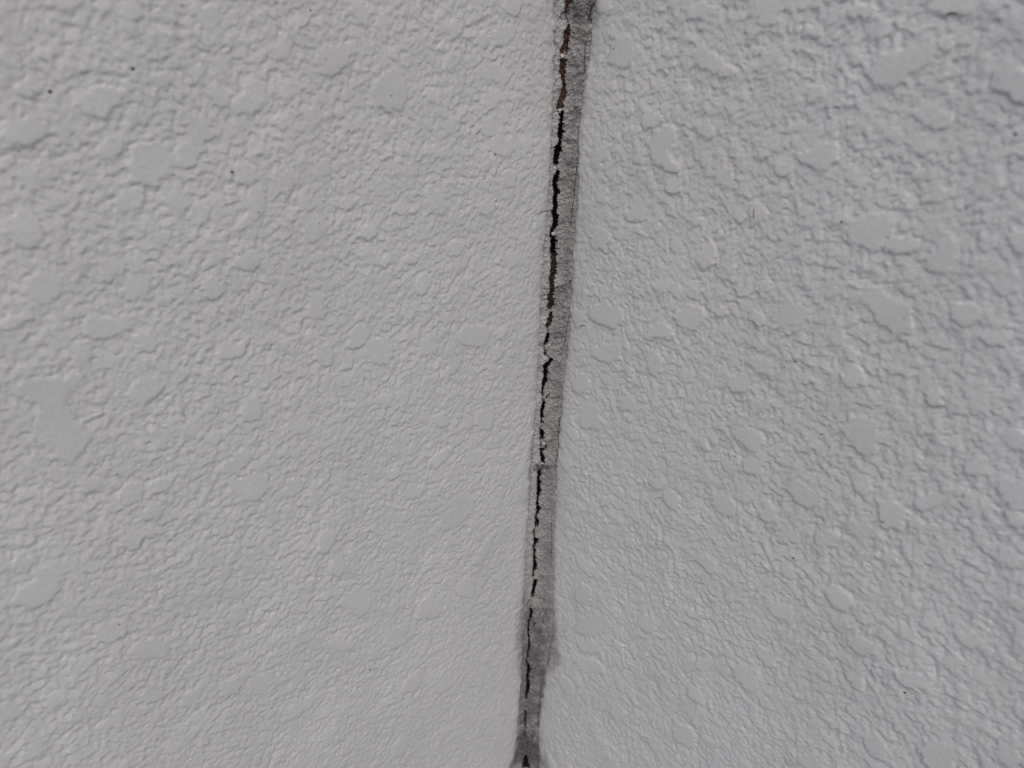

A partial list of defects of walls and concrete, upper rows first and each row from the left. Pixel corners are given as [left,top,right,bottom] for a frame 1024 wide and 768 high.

crack [518,0,595,768]